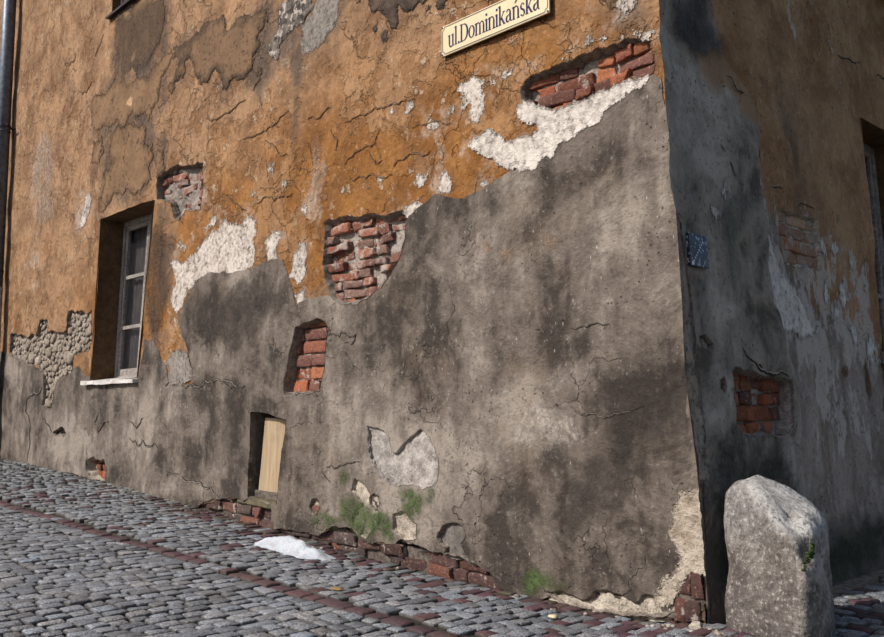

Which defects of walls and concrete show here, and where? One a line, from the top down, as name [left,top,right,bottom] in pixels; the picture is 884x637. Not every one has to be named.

peeling [79,0,313,227]
crack [206,78,260,121]
crack [243,111,288,156]
crack [308,98,430,182]
peeling [448,7,664,172]
crack [222,192,292,210]
peeling [288,241,308,305]
spalling [322,170,452,305]
spalling [9,309,99,410]
spalling [283,318,329,395]
spalling [366,426,439,489]
flaking render [198,479,502,590]